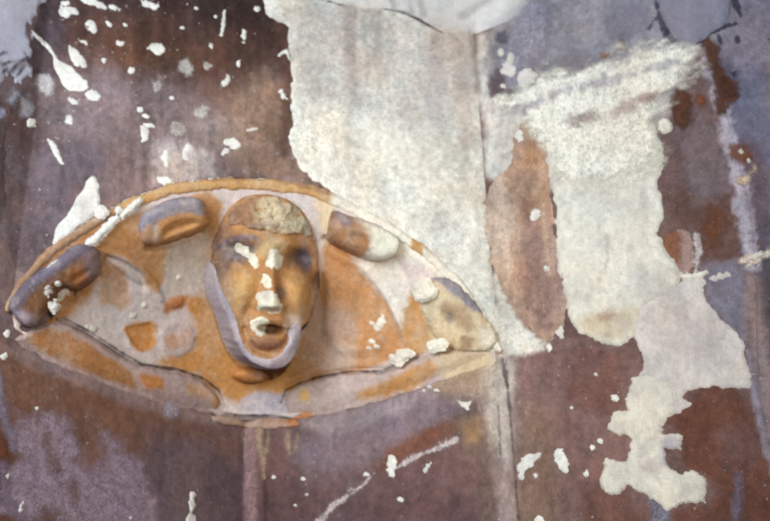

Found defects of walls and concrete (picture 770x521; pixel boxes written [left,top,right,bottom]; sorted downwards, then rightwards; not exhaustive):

corrosion [670,37,738,129]
peeling [0,0,330,273]
corrosion [730,144,752,163]
peeling [43,281,70,315]
peeling [411,278,438,302]
peeling [483,39,756,511]
peeling [366,314,386,350]
peeling [389,348,416,367]
peeling [427,338,449,353]
corrosion [0,423,12,500]
water stain [0,375,160,521]